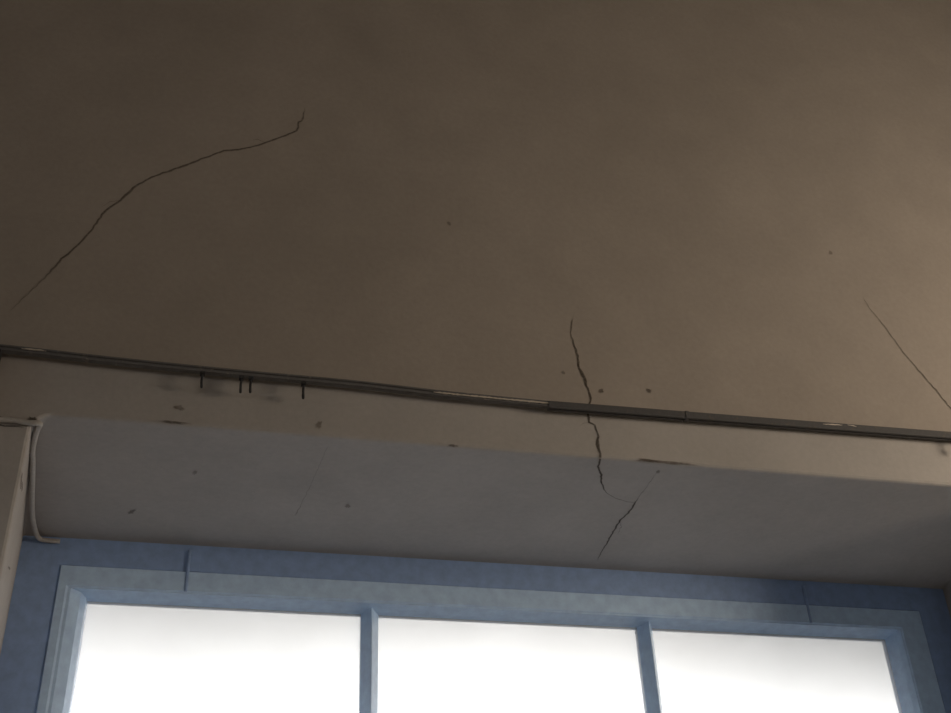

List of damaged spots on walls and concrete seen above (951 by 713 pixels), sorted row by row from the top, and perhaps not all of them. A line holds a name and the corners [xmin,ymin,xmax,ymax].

crack [53,118,304,268]
crack [571,323,606,492]
crack [600,499,638,554]